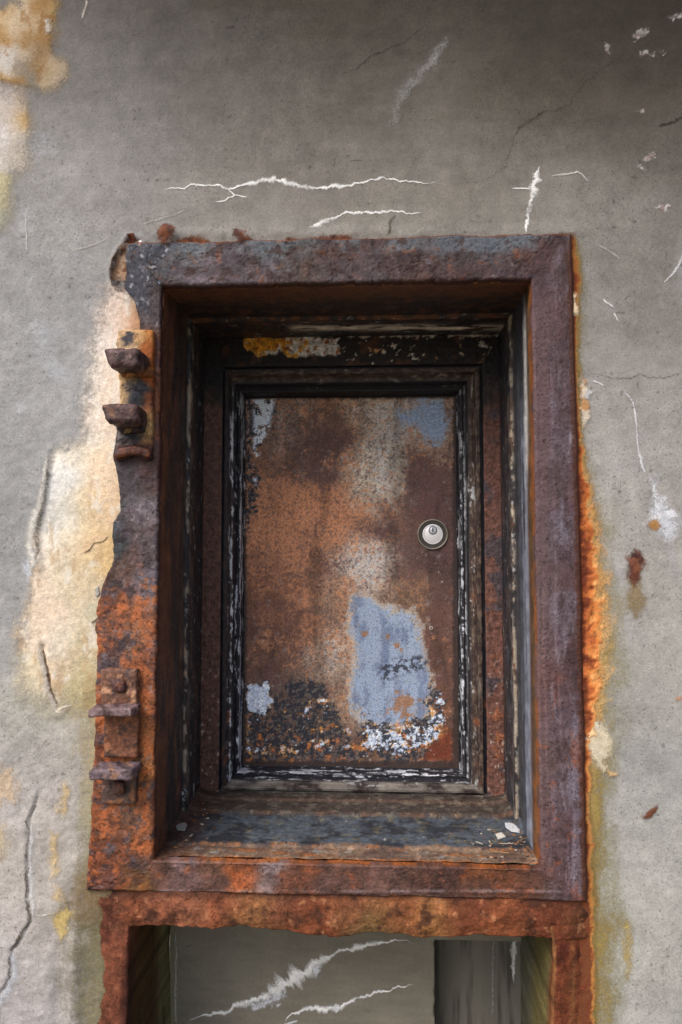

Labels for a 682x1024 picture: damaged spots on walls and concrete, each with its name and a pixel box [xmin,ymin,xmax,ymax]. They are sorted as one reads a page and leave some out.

rust [156,223,210,243]
rust [232,228,252,243]
crack [39,648,71,713]
crack [0,806,64,1004]